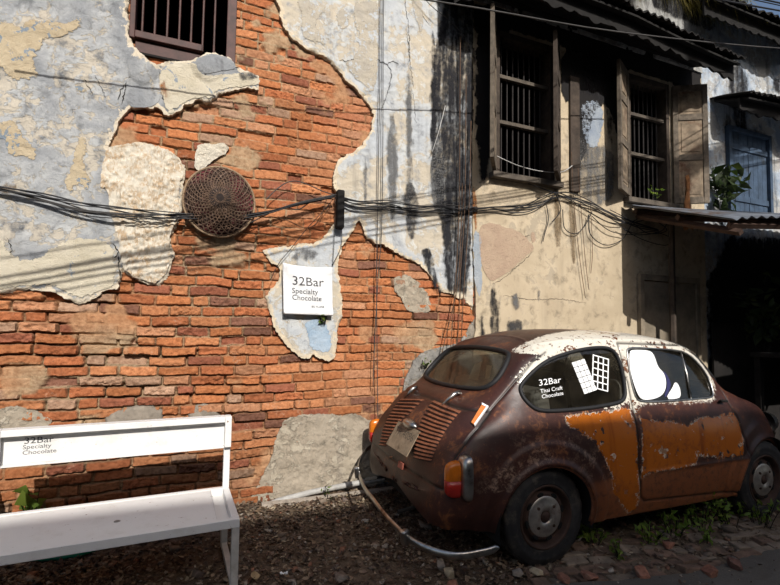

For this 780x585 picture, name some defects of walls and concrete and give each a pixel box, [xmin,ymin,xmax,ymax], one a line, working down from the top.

flaking render [0,0,536,514]
crack [378,2,428,120]
damp [422,0,701,293]